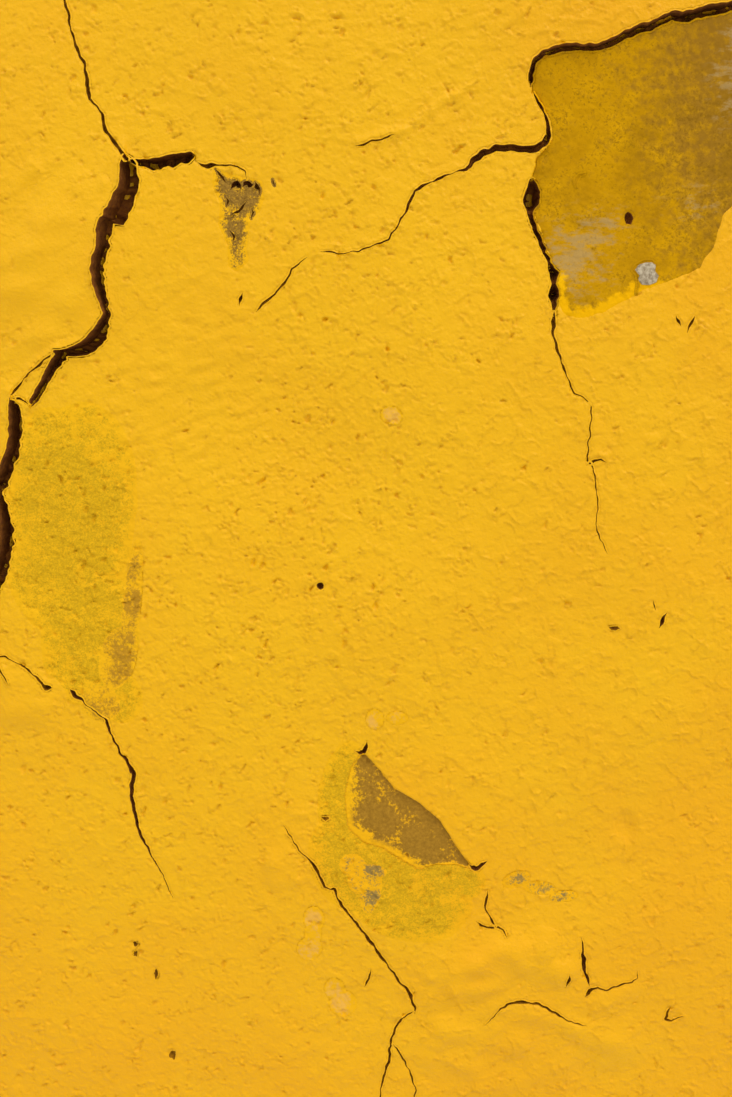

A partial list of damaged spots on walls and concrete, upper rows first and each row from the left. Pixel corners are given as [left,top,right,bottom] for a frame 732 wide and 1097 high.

crack [0,0,249,590]
peeling [213,168,276,271]
crack [237,91,552,313]
spalling [521,0,732,406]
crack [585,402,609,555]
crack [0,654,175,899]
crack [282,825,418,1097]
peeling [345,740,488,872]
crack [476,890,508,939]
crack [484,937,639,1027]